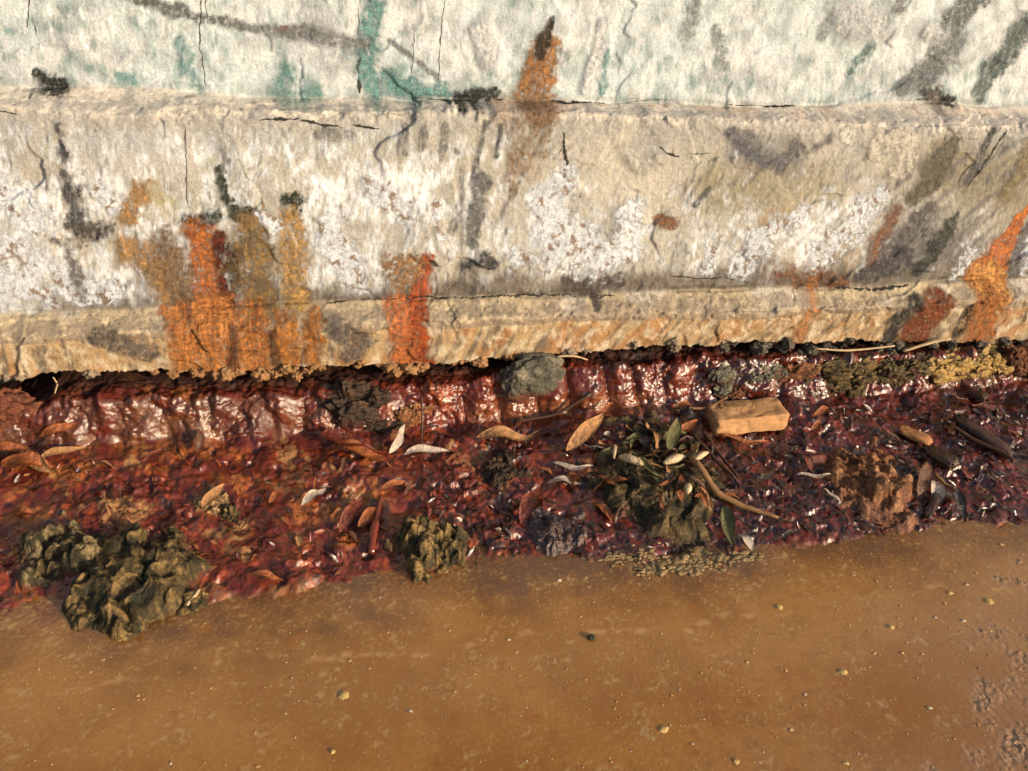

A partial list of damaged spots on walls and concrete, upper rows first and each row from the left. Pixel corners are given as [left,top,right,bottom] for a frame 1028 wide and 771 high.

leakage [50,123,115,302]
crack [183,129,191,206]
crack [199,0,208,85]
leakage [133,0,503,270]
corrosion [502,16,562,196]
leakage [849,41,877,76]
leakage [893,0,991,116]
leakage [971,12,1028,103]
corrosion [114,179,326,372]
corrosion [382,251,435,364]
corrosion [883,205,1028,343]